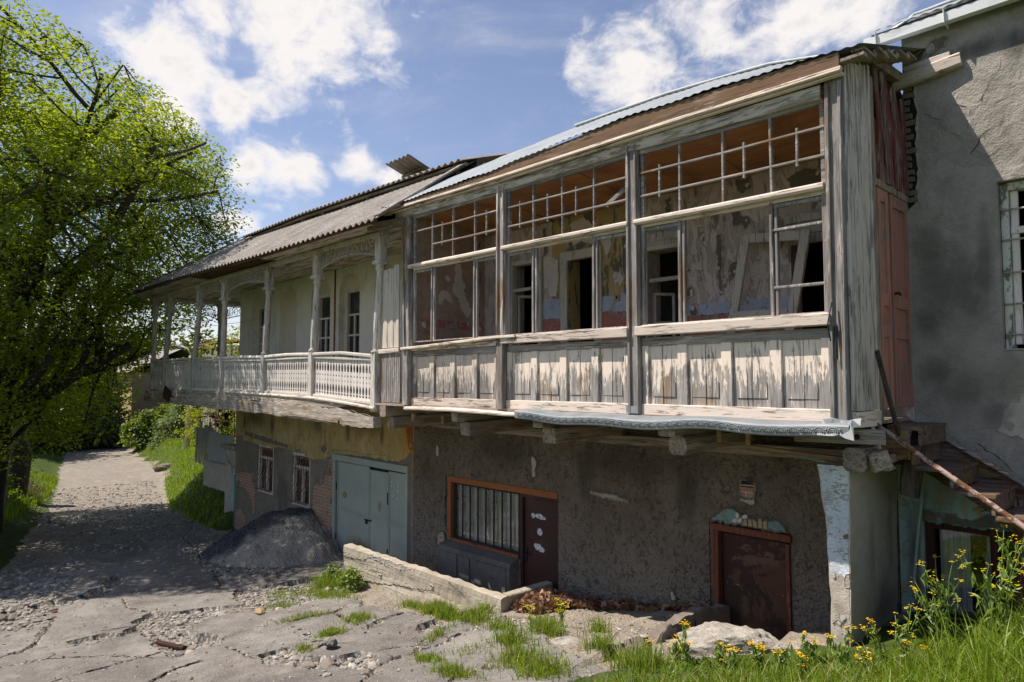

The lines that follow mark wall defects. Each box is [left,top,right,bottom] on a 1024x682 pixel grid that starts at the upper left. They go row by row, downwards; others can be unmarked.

peeling [734,176,753,195]
peeling [785,167,821,188]
peeling [542,227,559,297]
peeling [570,217,626,285]
peeling [700,231,737,296]
peeling [731,211,751,231]
peeling [687,285,698,317]
flaking render [312,445,333,537]
peeling [818,465,852,647]